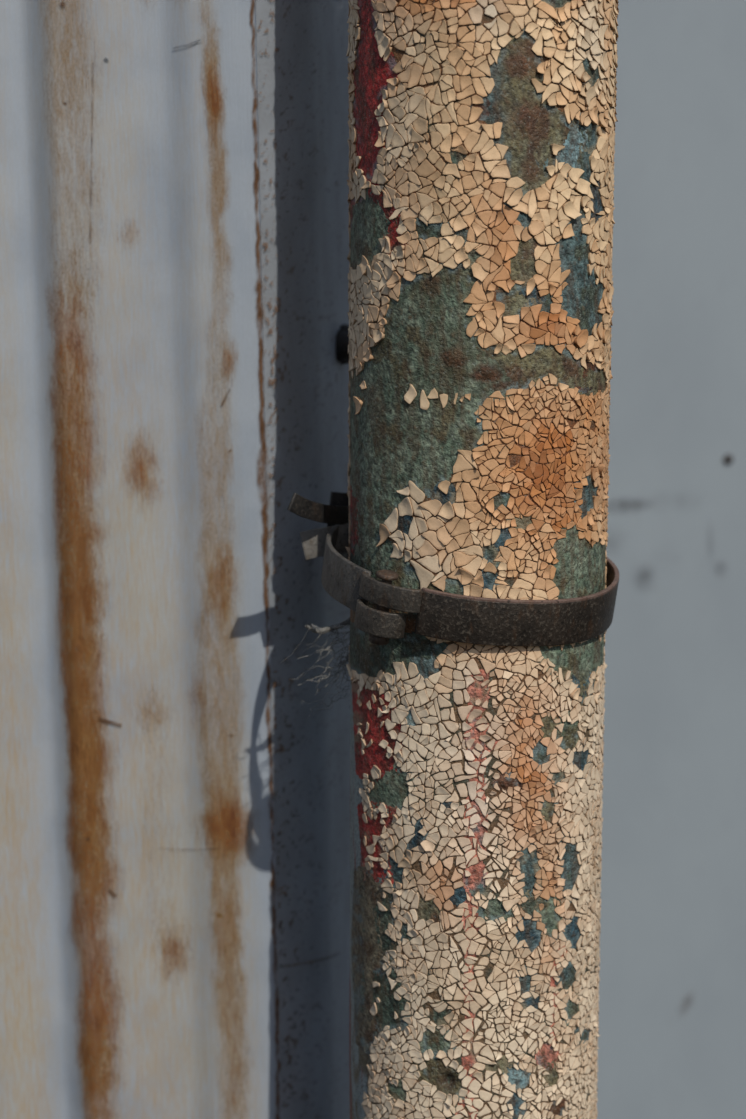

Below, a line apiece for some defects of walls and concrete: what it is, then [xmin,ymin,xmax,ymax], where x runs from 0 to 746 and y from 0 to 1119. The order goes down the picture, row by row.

rust [50,292,118,1119]
rust [206,48,228,262]
rust [202,695,248,1074]
rust [250,0,305,1119]
crack [384,384,558,600]
peeling [387,999,563,1119]
crack [346,630,607,1119]
peeling [350,621,604,1056]
peeling [345,0,612,599]
crack [347,0,619,547]
crack [592,499,609,588]